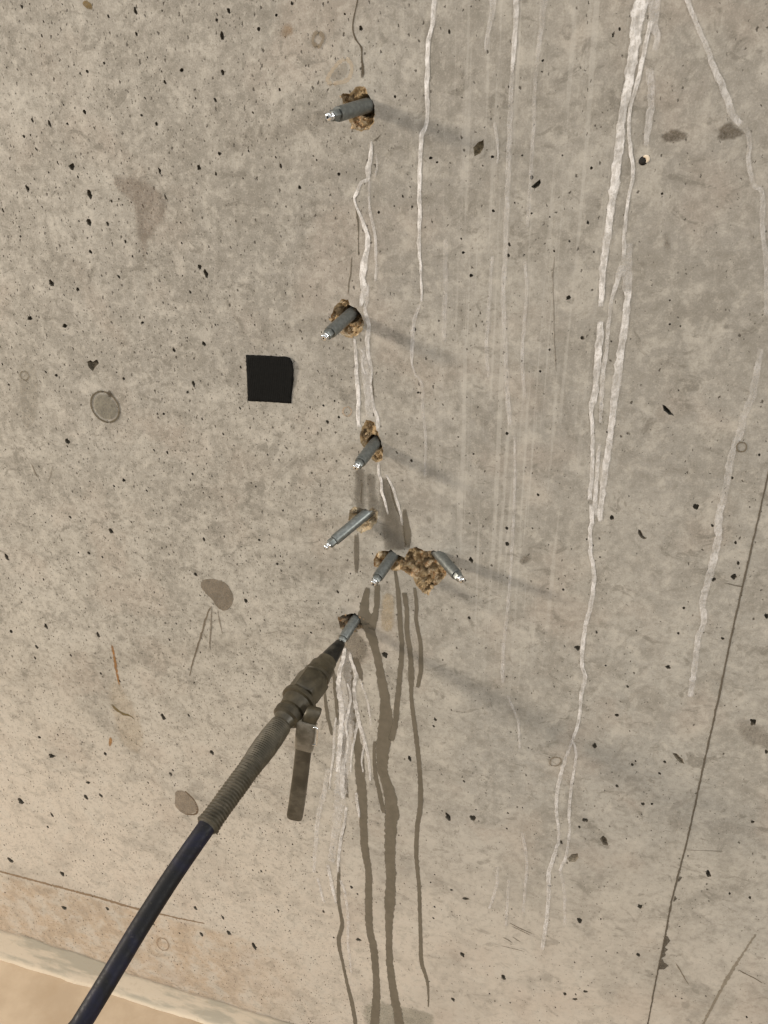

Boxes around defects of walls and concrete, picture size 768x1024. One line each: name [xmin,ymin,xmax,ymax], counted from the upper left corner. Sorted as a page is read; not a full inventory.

crack [352,0,364,77]
efflorescence [708,59,732,105]
efflorescence [417,0,437,300]
water stain [719,119,742,139]
crack [348,208,359,292]
crack [386,478,406,545]
efflorescence [541,0,653,948]
efflorescence [708,506,724,570]
crack [647,474,768,1024]
water stain [317,571,429,1024]